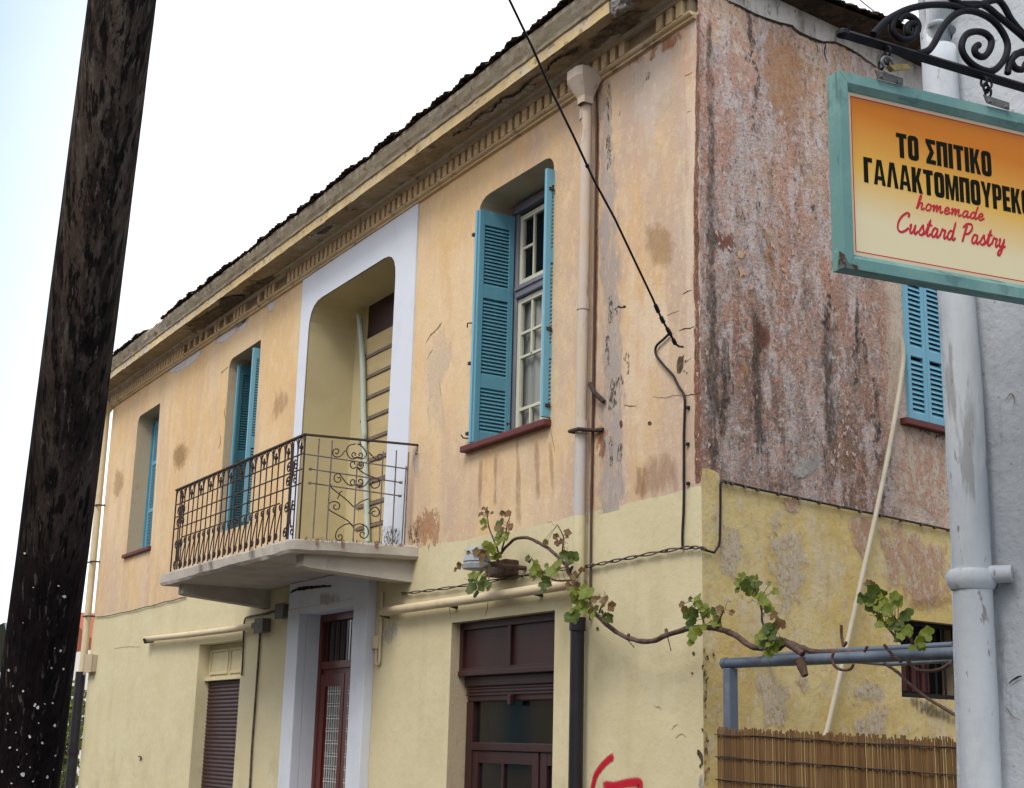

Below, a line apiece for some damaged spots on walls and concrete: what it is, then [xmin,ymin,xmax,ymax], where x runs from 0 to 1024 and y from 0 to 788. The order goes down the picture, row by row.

damp [745,12,761,133]
crack [729,1,876,67]
peeling [170,350,201,373]
peeling [215,318,249,343]
damp [705,102,735,469]
damp [749,314,768,455]
damp [818,294,835,485]
damp [852,298,868,392]
peeling [414,509,439,548]
crack [290,585,332,594]